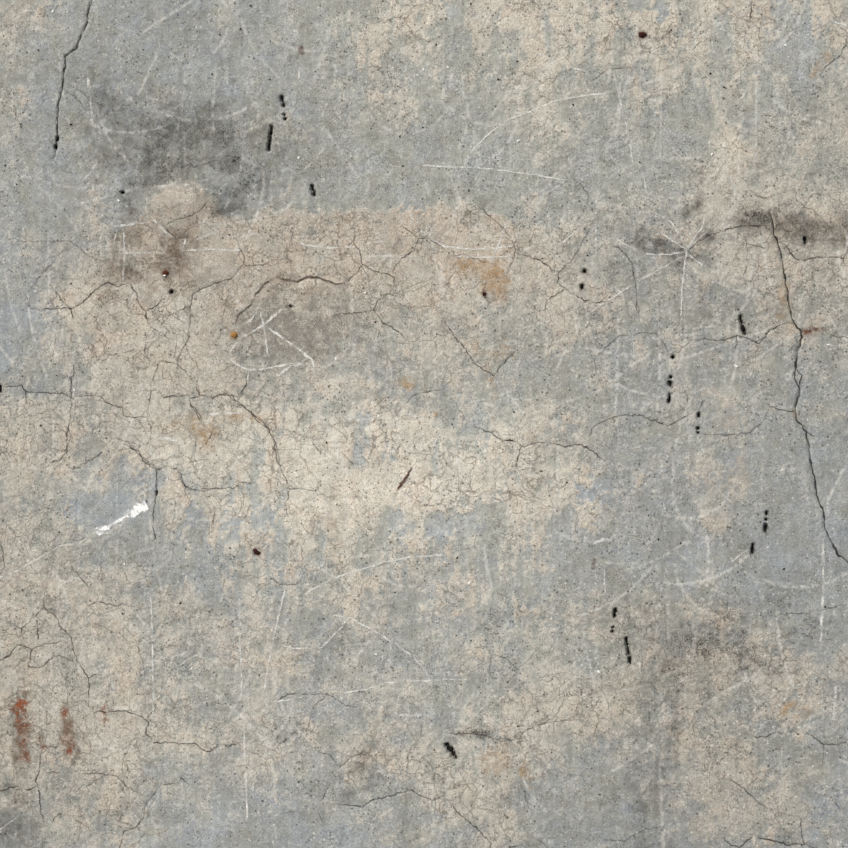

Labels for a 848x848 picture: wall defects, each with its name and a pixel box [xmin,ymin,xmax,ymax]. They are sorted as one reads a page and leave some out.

crack [55,1,92,155]
crack [348,227,476,335]
crack [510,242,603,303]
crack [7,265,297,511]
crack [706,218,848,562]
crack [122,440,244,539]
crack [4,604,96,695]
corrosion [12,699,30,760]
crack [101,710,236,752]
crack [725,823,814,848]